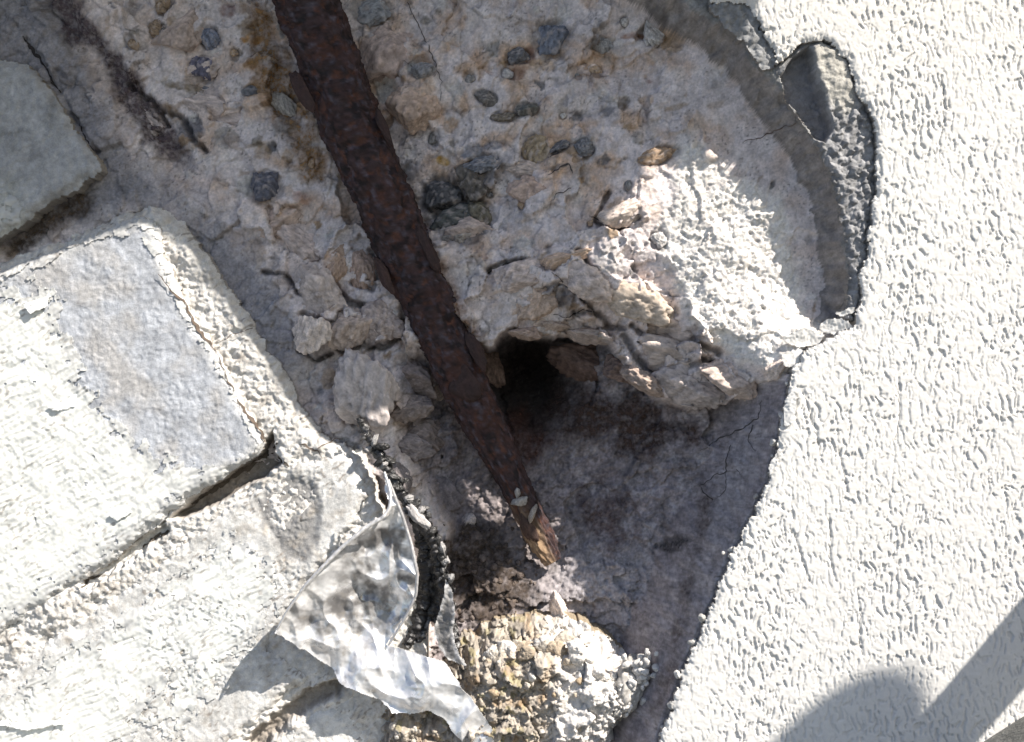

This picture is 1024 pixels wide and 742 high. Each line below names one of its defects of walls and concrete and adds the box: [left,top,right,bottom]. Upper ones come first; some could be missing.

crack [81,574,102,588]
peeling [0,250,262,632]
crack [142,530,169,548]
spalling [0,0,438,449]
crack [158,274,339,505]
spalling [255,440,281,465]
corrosion [251,0,561,566]
spalling [332,0,855,742]
crack [699,400,762,500]
spalling [775,41,876,312]